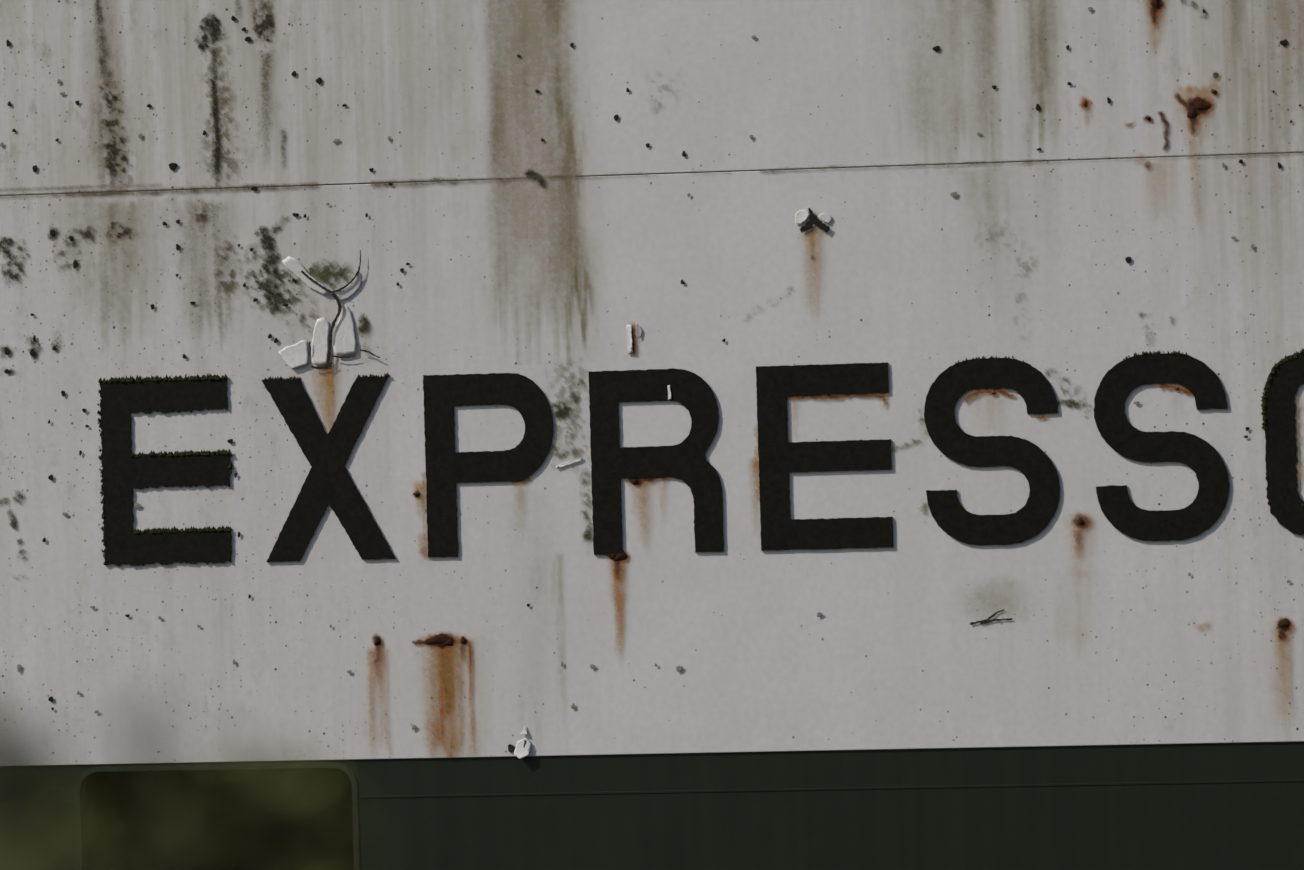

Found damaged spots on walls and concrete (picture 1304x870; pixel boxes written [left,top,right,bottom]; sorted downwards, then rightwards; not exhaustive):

damp [1275,0,1303,53]
corrosion [1127,111,1169,150]
corrosion [1175,72,1219,135]
damp [492,0,590,340]
corrosion [607,550,628,635]
corrosion [372,634,382,668]
corrosion [1276,618,1293,661]
corrosion [412,633,473,757]